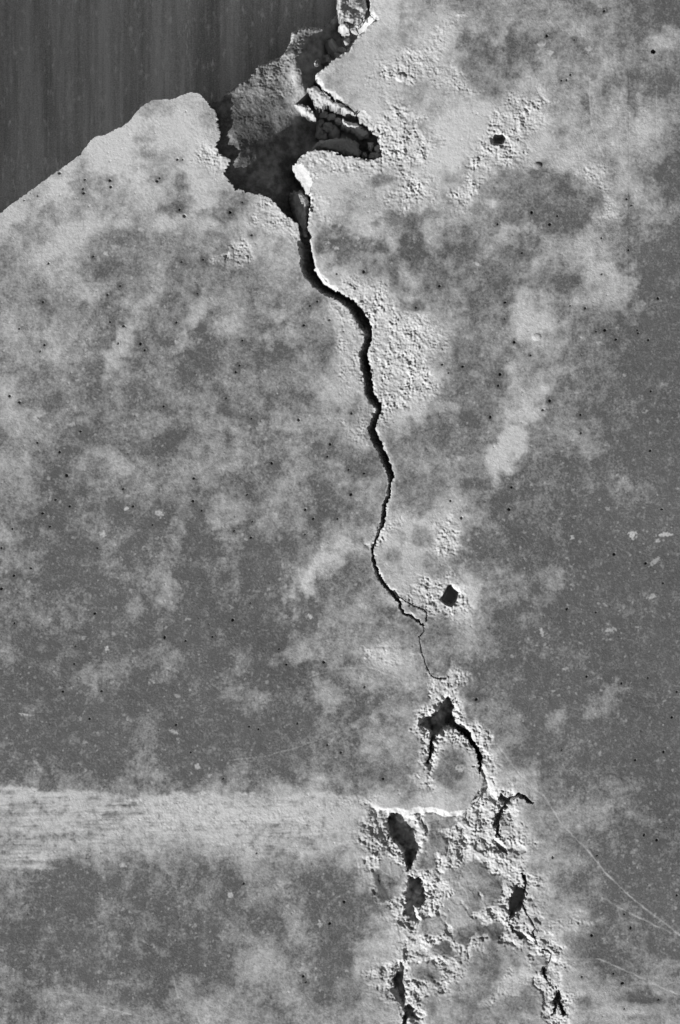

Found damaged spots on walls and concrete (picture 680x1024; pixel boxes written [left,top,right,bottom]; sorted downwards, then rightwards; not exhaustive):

crack [297,239,567,1017]
spalling [401,512,470,626]
spalling [364,664,602,1024]